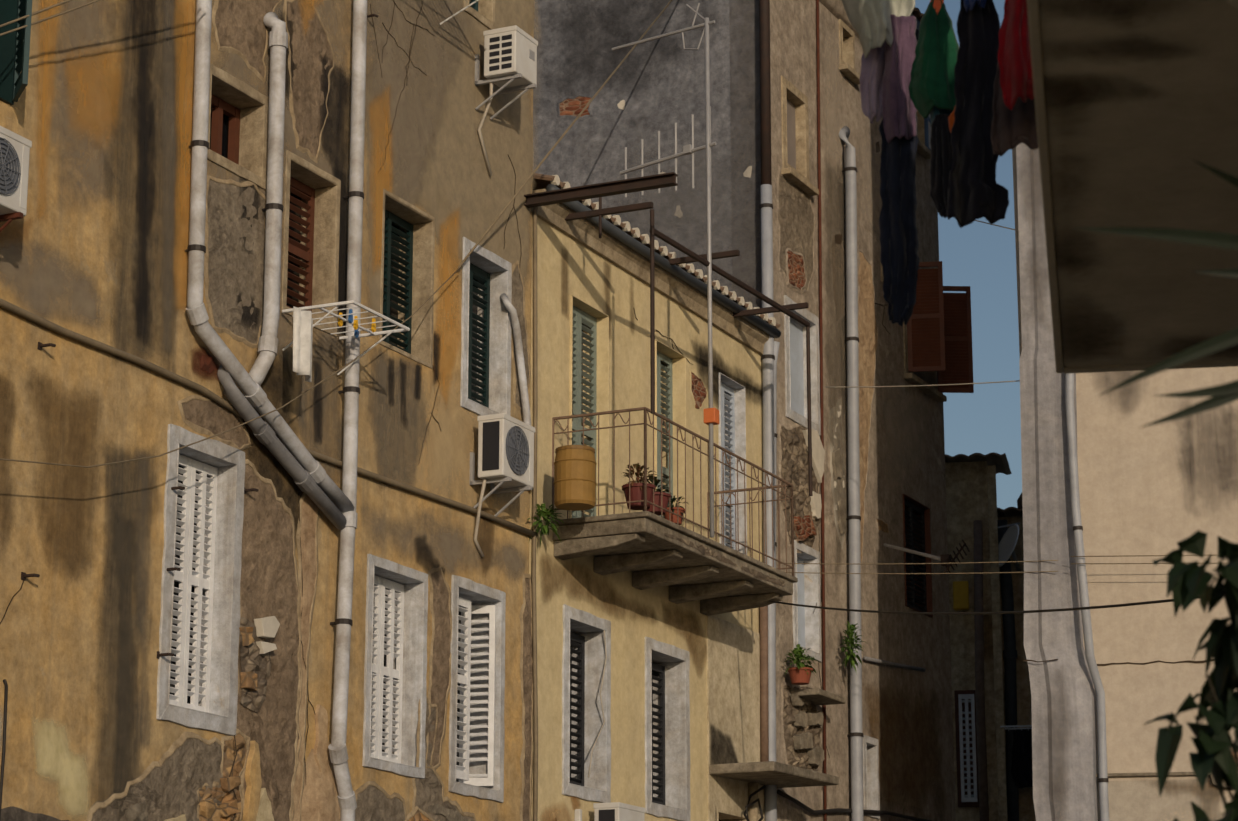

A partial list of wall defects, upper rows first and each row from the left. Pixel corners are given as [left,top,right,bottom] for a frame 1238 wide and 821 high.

leakage [77,0,194,358]
corrosion [192,348,220,379]
spalling [209,0,349,350]
peeling [365,0,537,414]
flaking render [556,92,594,121]
spalling [777,170,815,295]
spalling [779,233,890,573]
spalling [86,395,330,821]
spalling [355,515,534,821]
leakage [543,560,704,661]